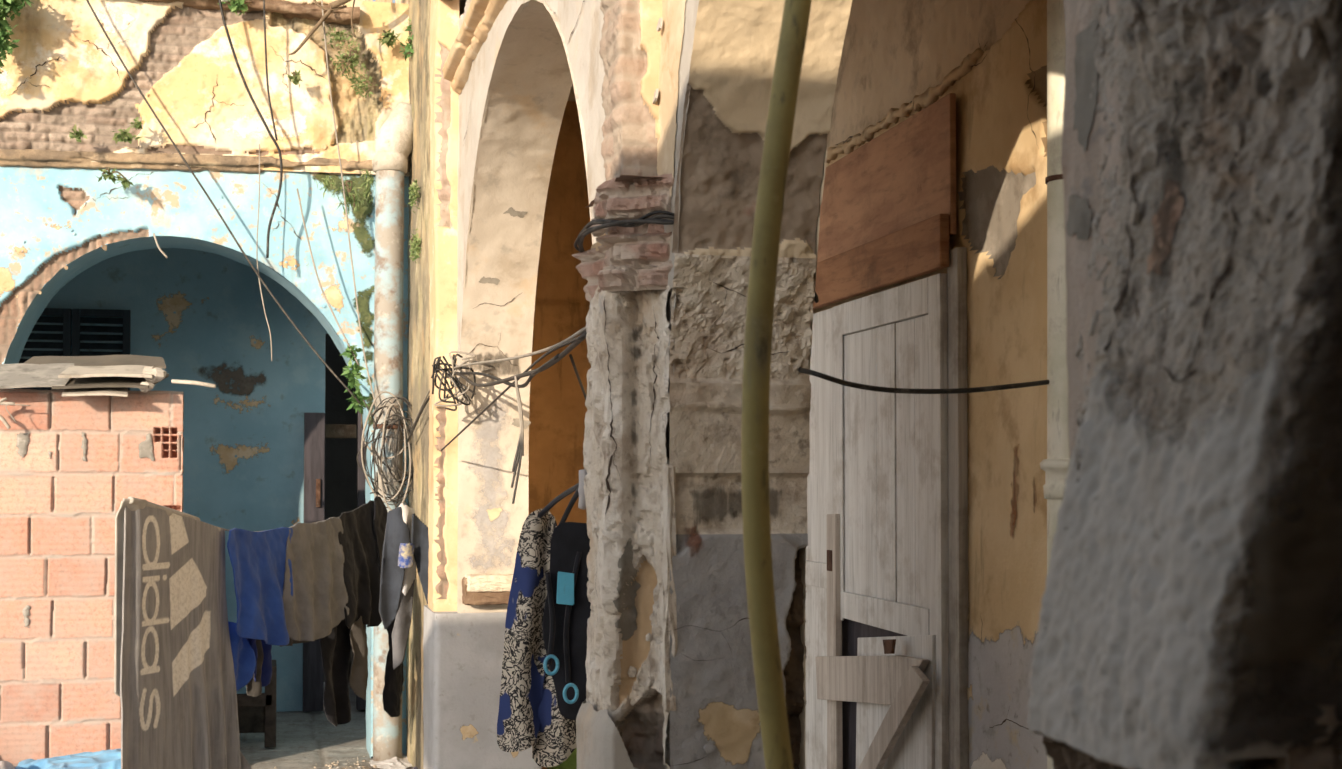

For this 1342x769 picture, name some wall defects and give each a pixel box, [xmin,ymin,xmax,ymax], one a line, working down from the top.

spalling [0,3,383,156]
peeling [599,0,764,254]
peeling [780,0,1033,254]
peeling [1025,65,1047,157]
spalling [0,186,149,364]
peeling [279,255,300,271]
peeling [322,284,344,314]
peeling [958,165,1036,279]
peeling [210,442,270,475]
spalling [618,559,665,769]
peeling [697,702,760,765]
peeling [971,752,1007,769]